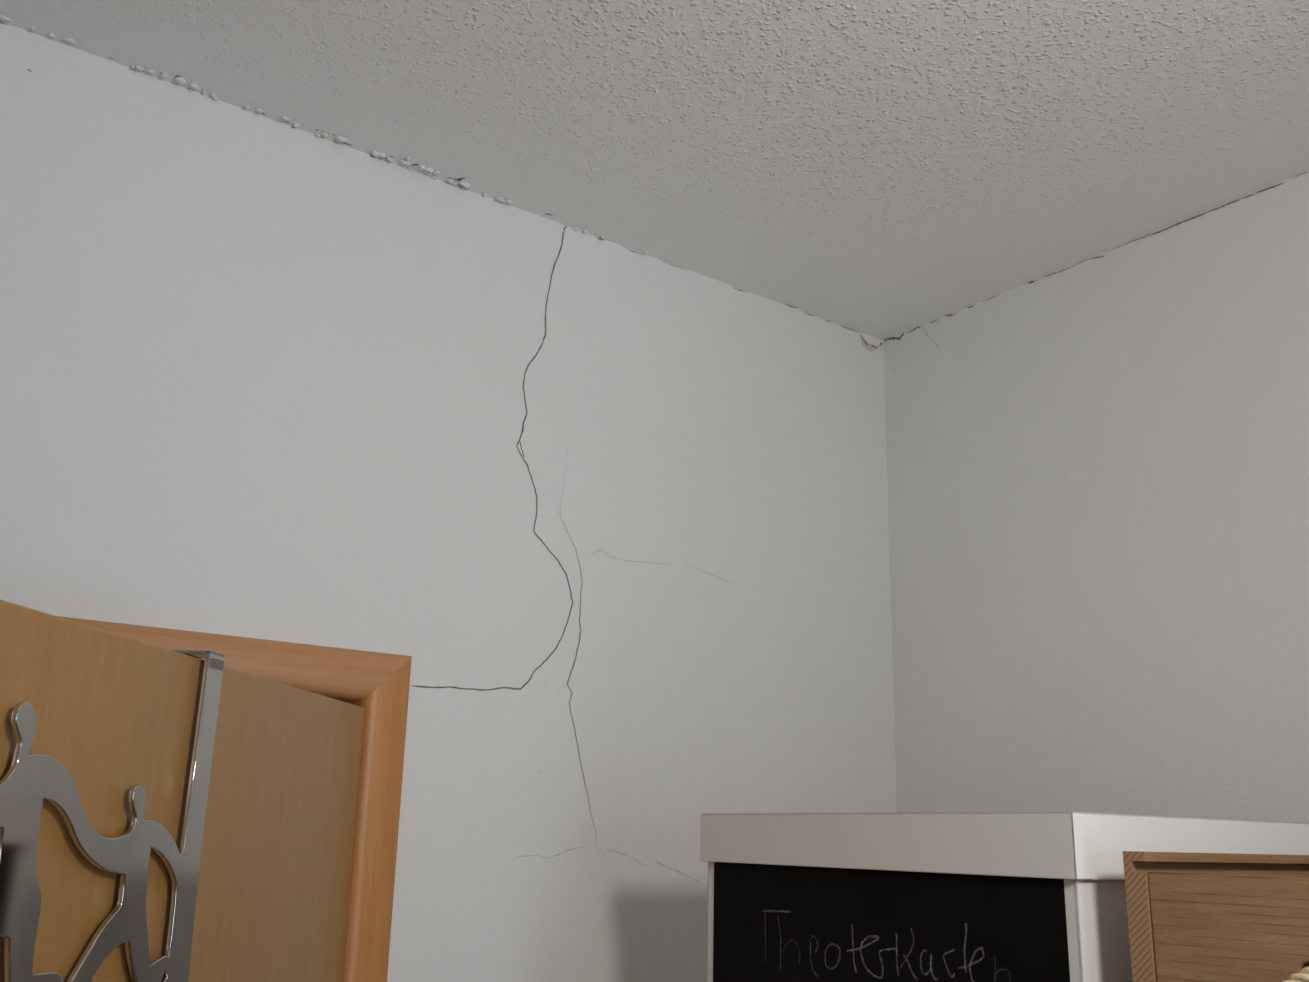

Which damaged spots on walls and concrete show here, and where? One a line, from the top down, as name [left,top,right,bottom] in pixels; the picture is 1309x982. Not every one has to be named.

crack [1028,172,1306,284]
crack [884,295,998,341]
crack [414,226,587,790]